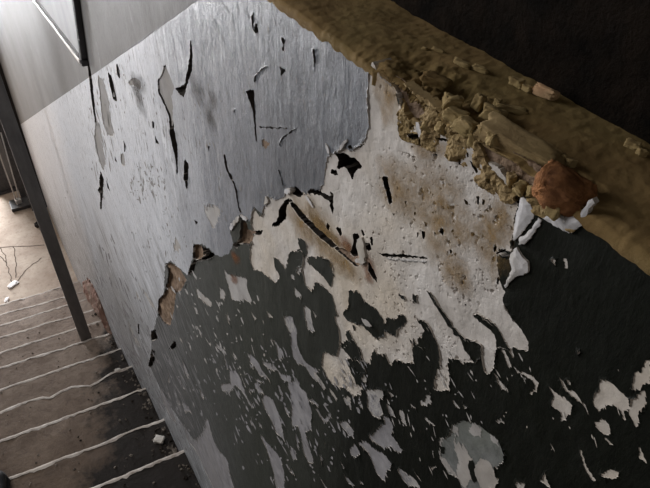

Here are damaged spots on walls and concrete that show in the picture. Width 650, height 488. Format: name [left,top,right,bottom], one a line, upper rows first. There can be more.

spalling [623,137,649,157]
crack [238,220,257,243]
crack [195,244,214,260]
spalling [82,57,599,488]
crack [151,263,186,366]
peeling [593,360,650,426]
peeling [595,419,612,444]
peeling [602,469,619,479]